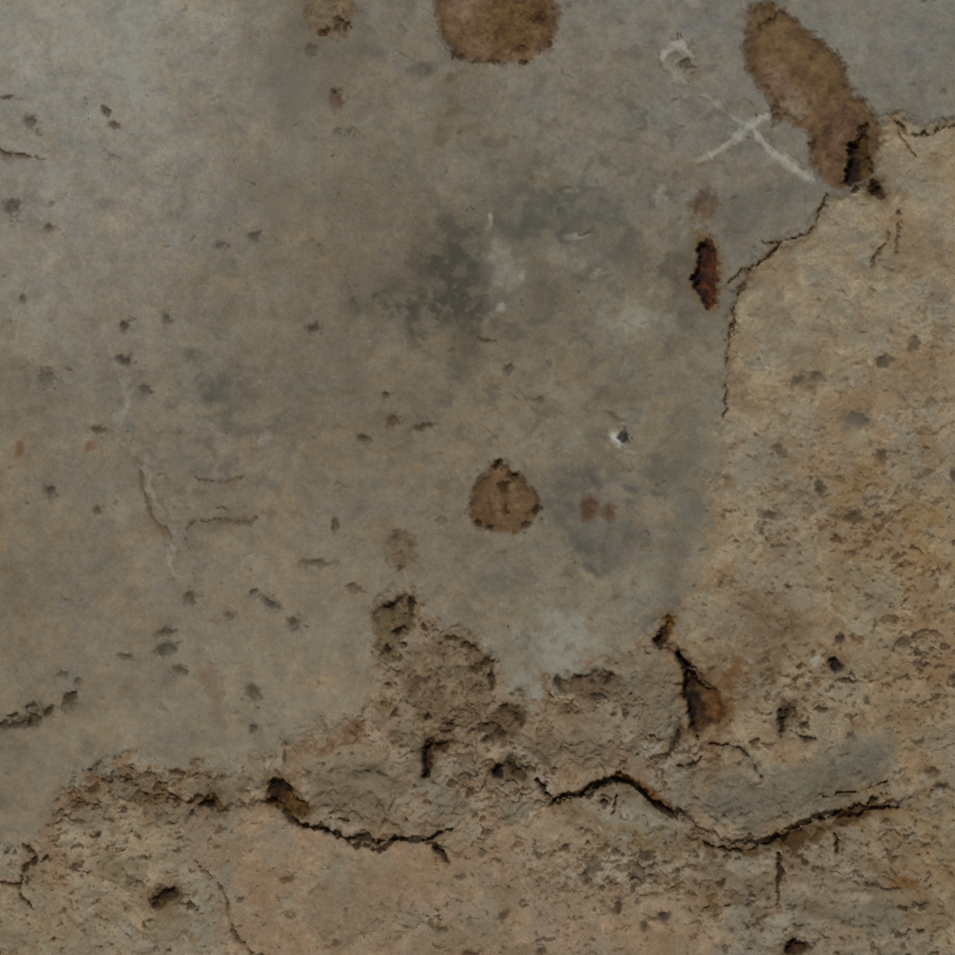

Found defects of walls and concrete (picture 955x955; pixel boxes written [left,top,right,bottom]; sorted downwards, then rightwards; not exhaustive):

spalling [302,0,360,61]
spalling [433,0,562,69]
spalling [2,198,26,221]
crack [723,196,829,418]
spalling [386,412,439,435]
spalling [464,459,547,537]
spalling [552,0,955,955]
spalling [385,529,419,575]
spalling [0,583,774,955]
crack [535,757,684,817]
crack [280,811,455,865]
crack [703,780,901,908]